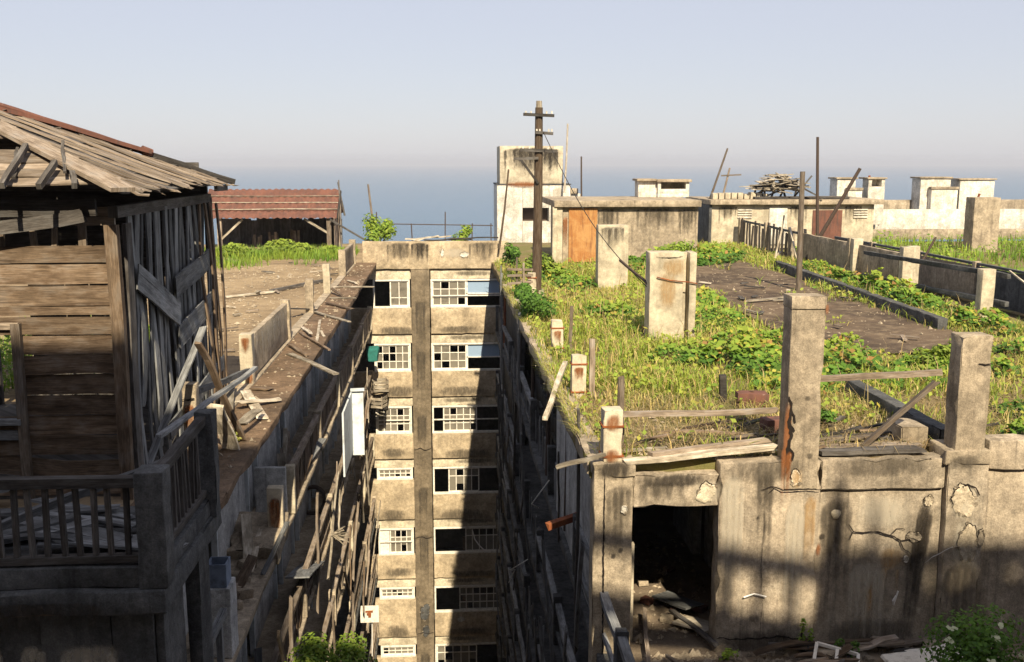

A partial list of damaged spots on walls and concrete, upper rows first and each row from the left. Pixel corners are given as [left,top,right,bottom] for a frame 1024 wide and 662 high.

corrosion [781,409,799,483]
spalling [696,480,718,503]
spalling [790,468,802,487]
corrosion [269,499,280,527]
crack [717,397,821,641]
spalling [951,482,985,564]
crack [849,525,952,563]